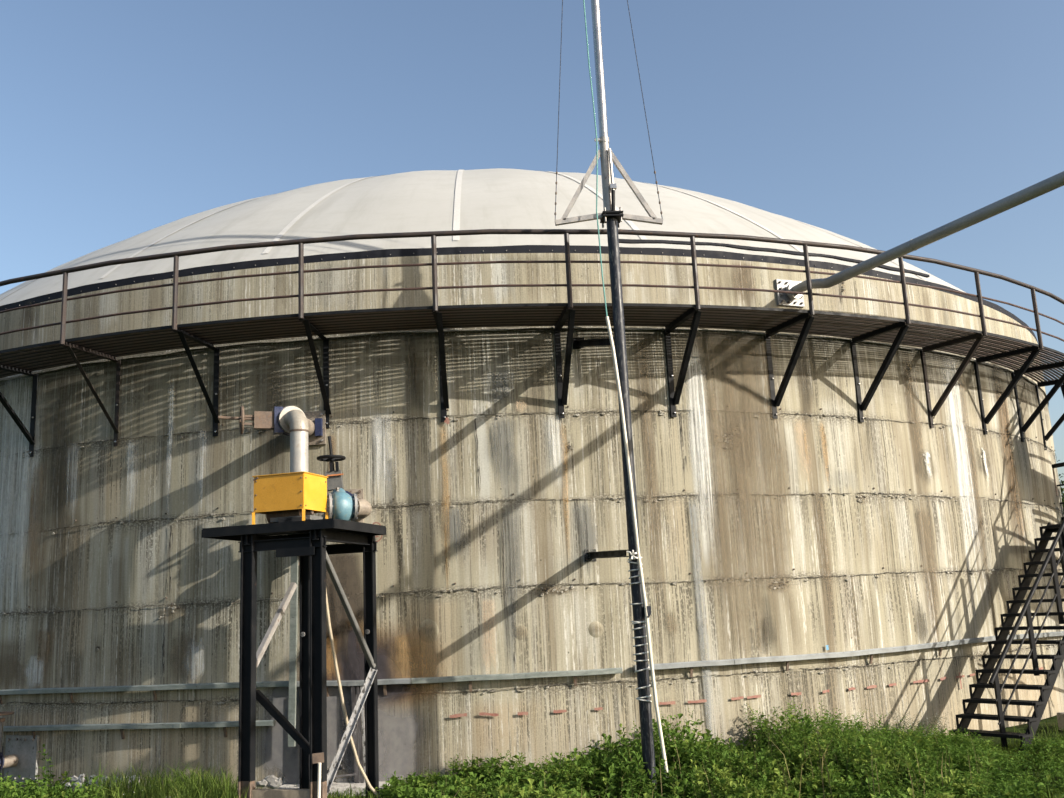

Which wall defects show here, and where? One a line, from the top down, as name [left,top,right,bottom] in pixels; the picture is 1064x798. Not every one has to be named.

damp [0,381,29,563]
damp [946,365,988,514]